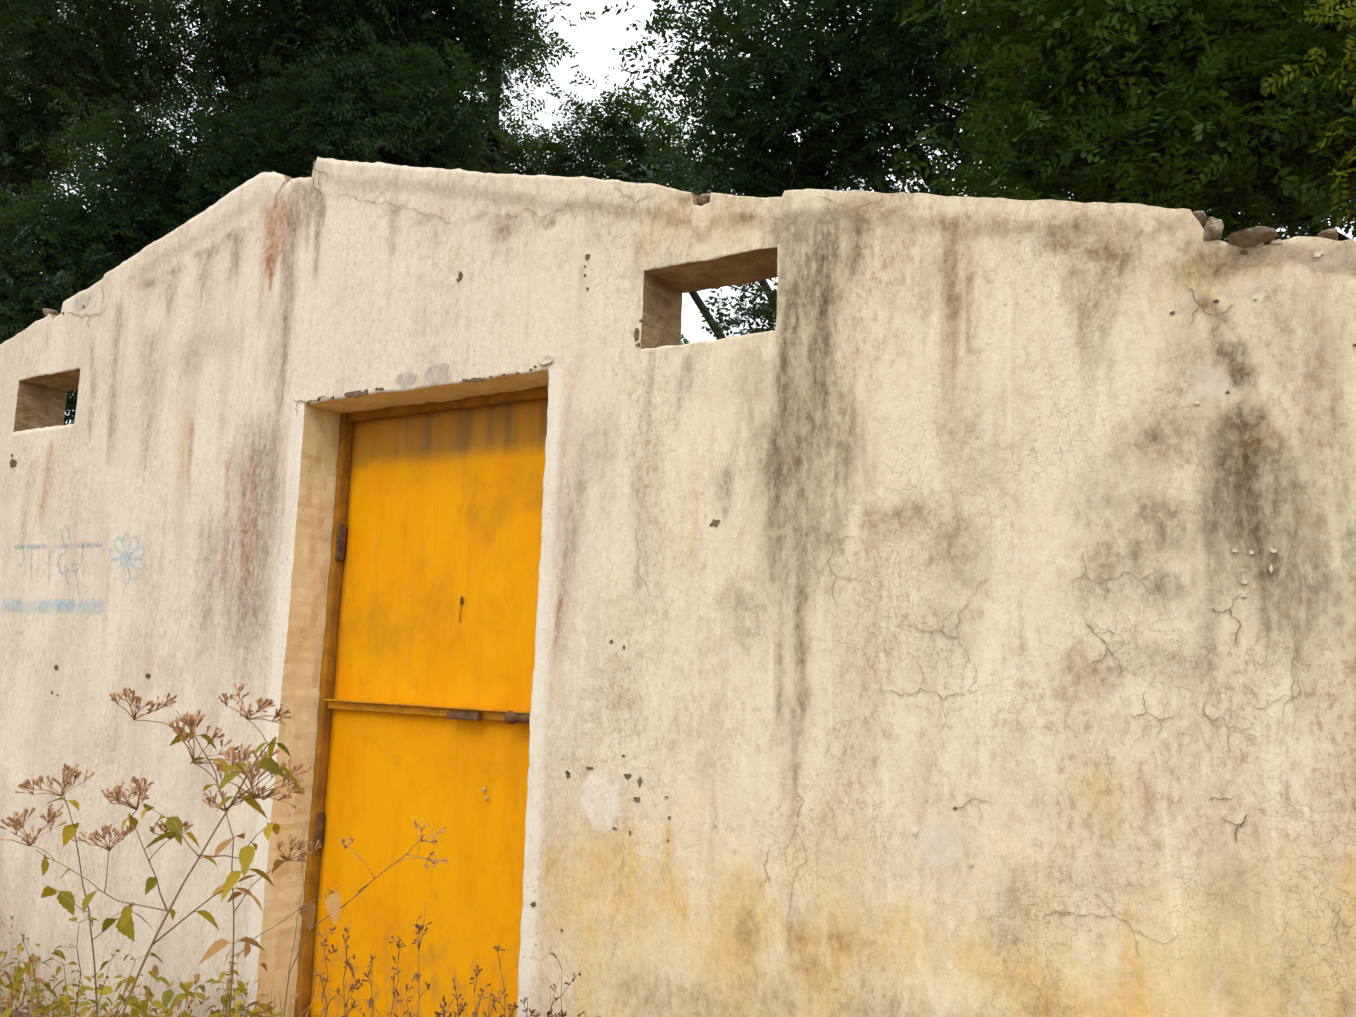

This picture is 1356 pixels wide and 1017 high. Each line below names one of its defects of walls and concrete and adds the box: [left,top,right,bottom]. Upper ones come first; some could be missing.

rust [266,203,287,279]
spalling [1234,239,1356,274]
water stain [1217,412,1278,555]
crack [880,578,991,727]
crack [1068,549,1301,762]
crack [1209,796,1248,843]
crack [1020,894,1186,956]
crack [1333,903,1354,952]